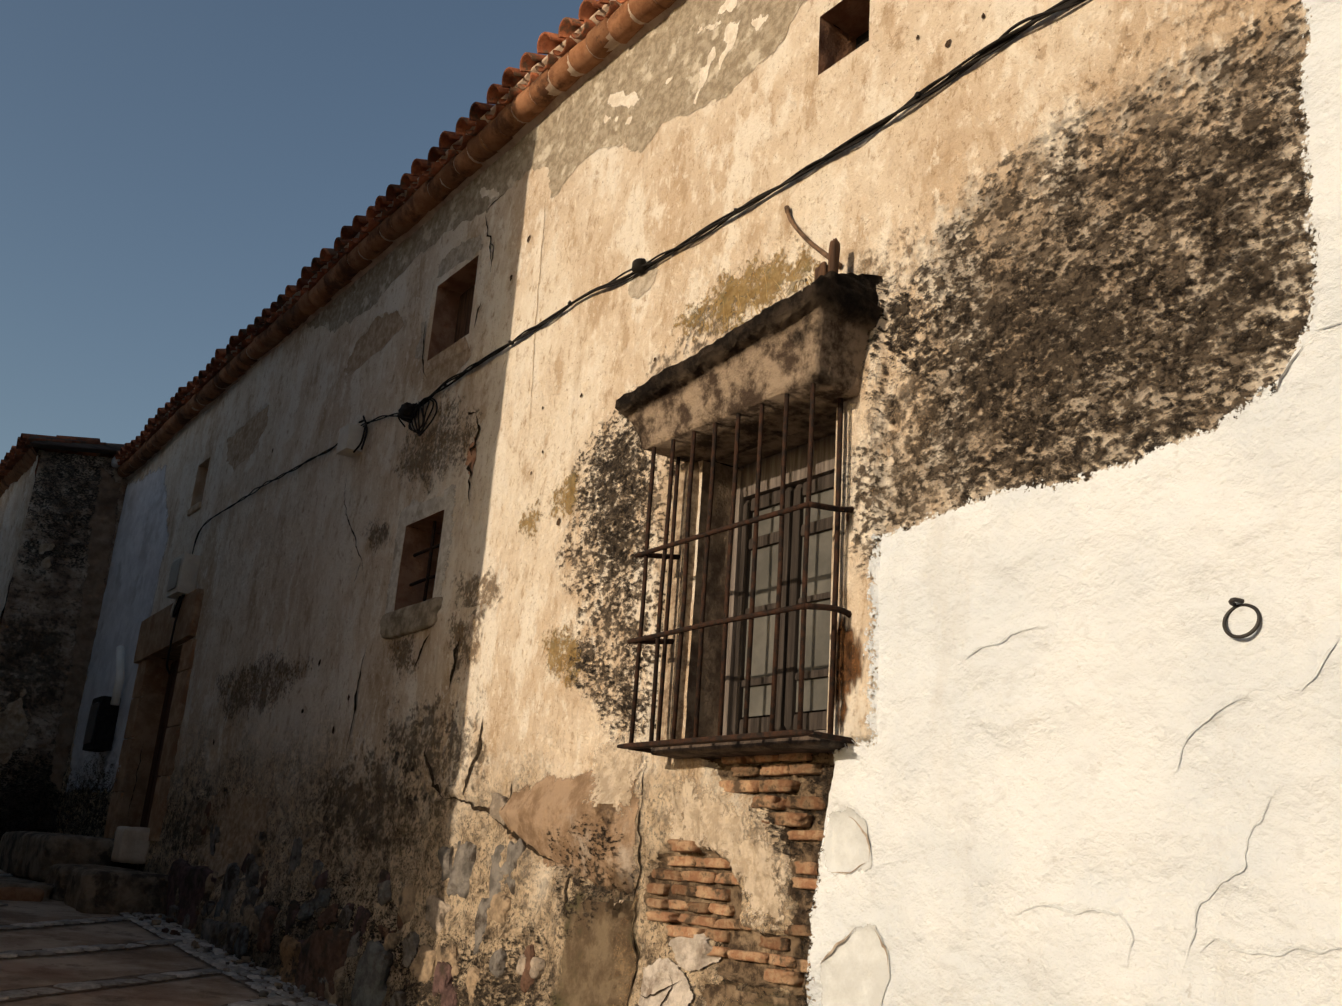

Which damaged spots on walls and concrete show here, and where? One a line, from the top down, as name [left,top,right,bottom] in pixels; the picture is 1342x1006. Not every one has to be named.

leakage [646,277,755,375]
leakage [842,0,1320,570]
leakage [555,410,676,745]
corrosion [834,616,864,729]
leakage [248,693,639,1006]
crack [424,719,571,916]
flaking render [644,752,872,1006]